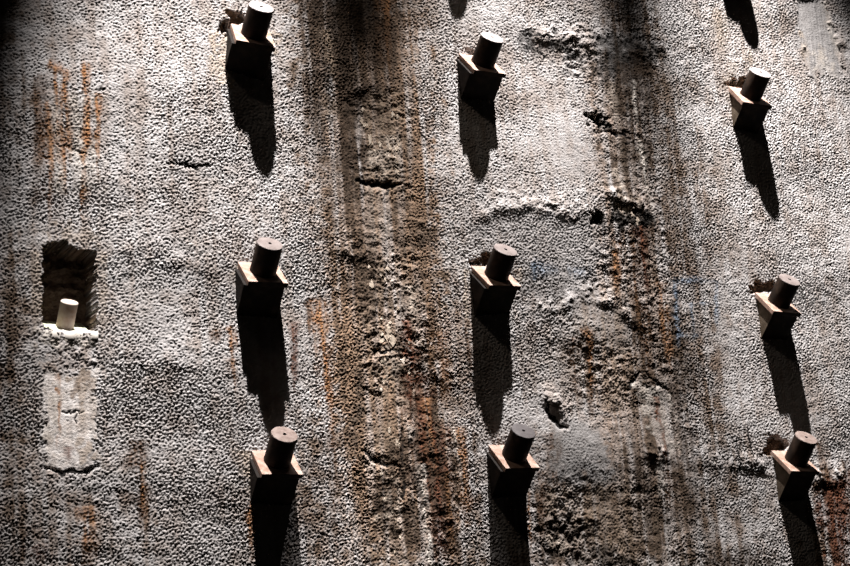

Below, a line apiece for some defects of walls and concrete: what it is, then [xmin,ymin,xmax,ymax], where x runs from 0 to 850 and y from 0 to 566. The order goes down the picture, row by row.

rust [45,61,71,175]
rust [81,64,101,160]
damp [301,0,396,182]
damp [594,0,658,197]
crack [356,180,401,195]
damp [609,207,652,235]
rust [306,300,332,401]
damp [388,404,442,502]
damp [403,501,432,565]
rust [817,479,850,566]